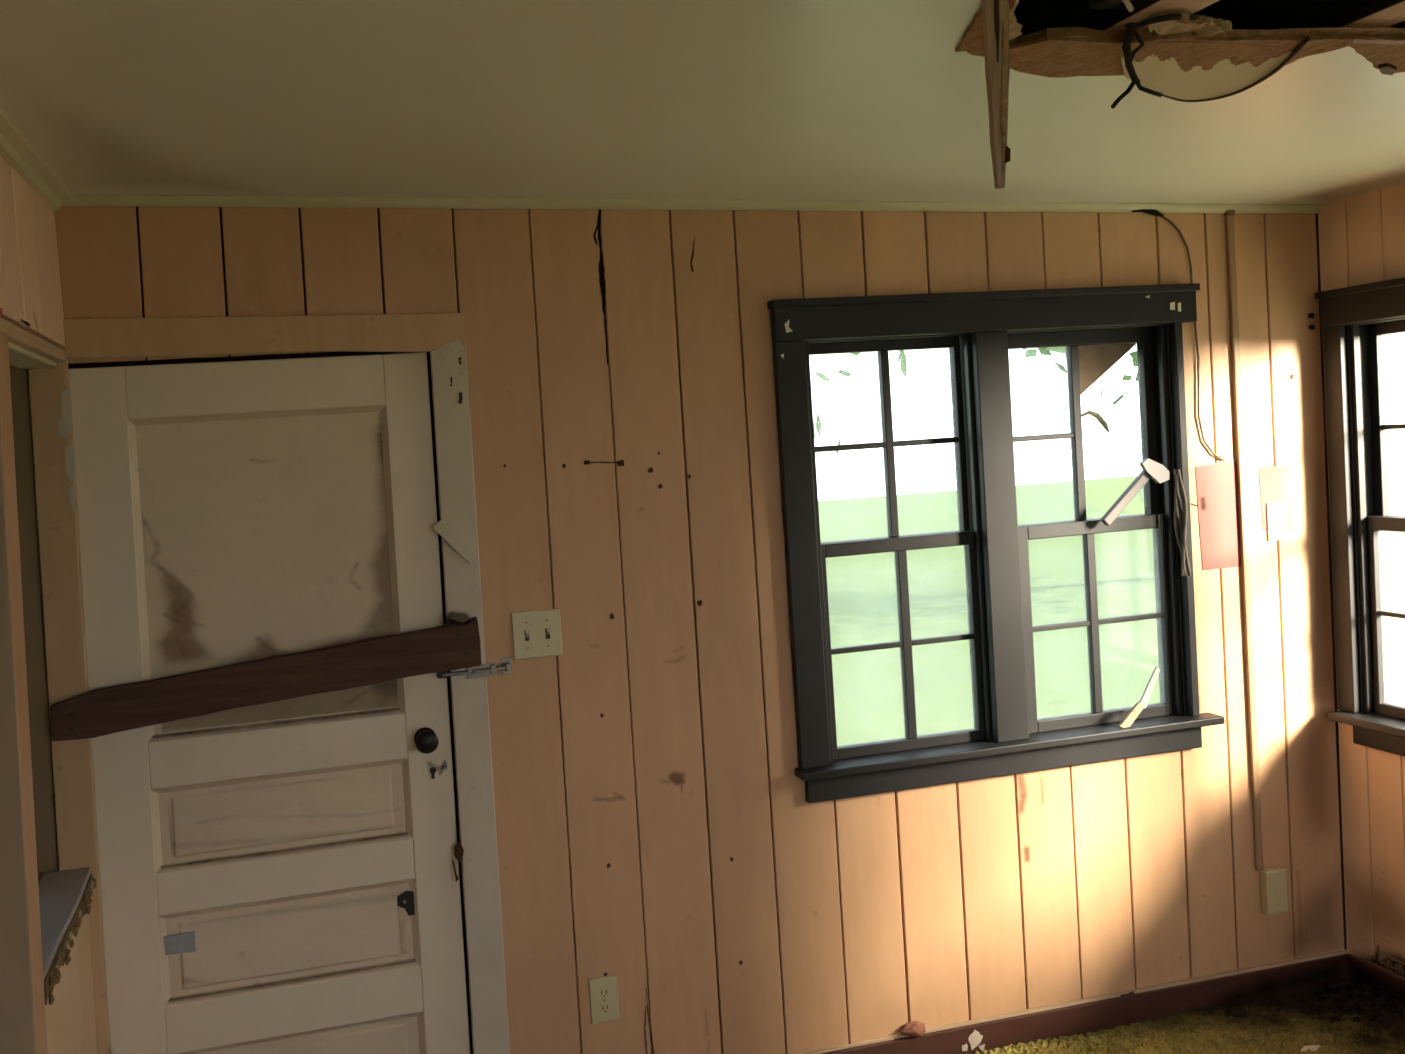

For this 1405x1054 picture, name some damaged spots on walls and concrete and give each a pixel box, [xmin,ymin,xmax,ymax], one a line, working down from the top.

peeling [955,6,984,52]
peeling [1208,35,1405,75]
crack [593,209,608,364]